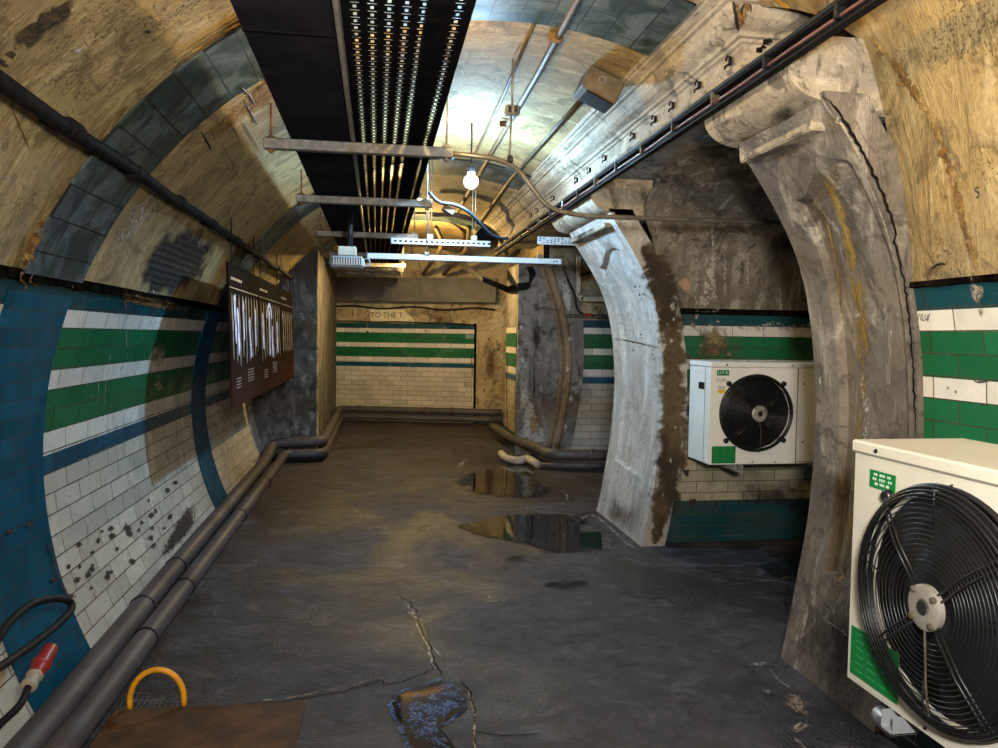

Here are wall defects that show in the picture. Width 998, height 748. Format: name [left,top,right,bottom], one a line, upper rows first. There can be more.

corrosion [870,36,979,273]
spalling [48,499,173,598]
crack [244,583,539,748]